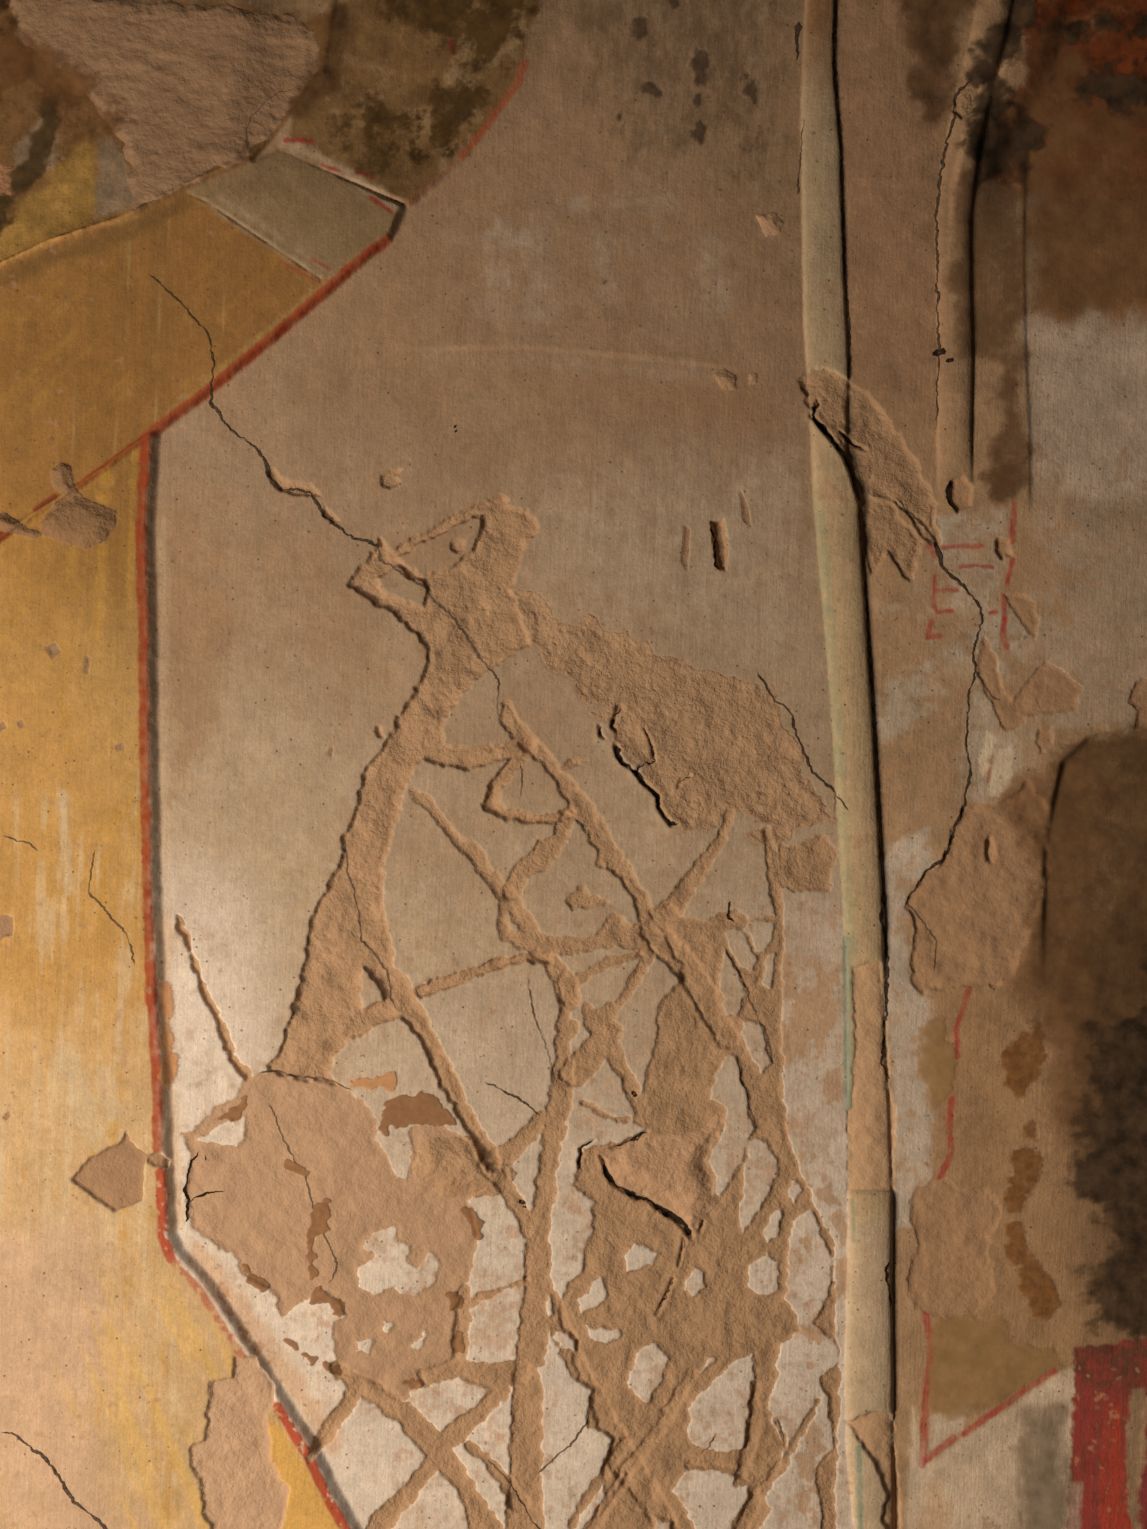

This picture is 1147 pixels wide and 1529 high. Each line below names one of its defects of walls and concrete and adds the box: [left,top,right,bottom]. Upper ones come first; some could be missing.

spalling [0,164,16,196]
water stain [0,0,95,231]
water stain [332,0,539,173]
crack [794,0,851,379]
water stain [963,0,1147,184]
spalling [270,469,339,523]
crack [150,276,500,721]
crack [756,402,999,1078]
spalling [176,491,901,1529]
water stain [1001,728,1147,1339]
spalling [70,1131,170,1212]
crack [1,1432,107,1529]